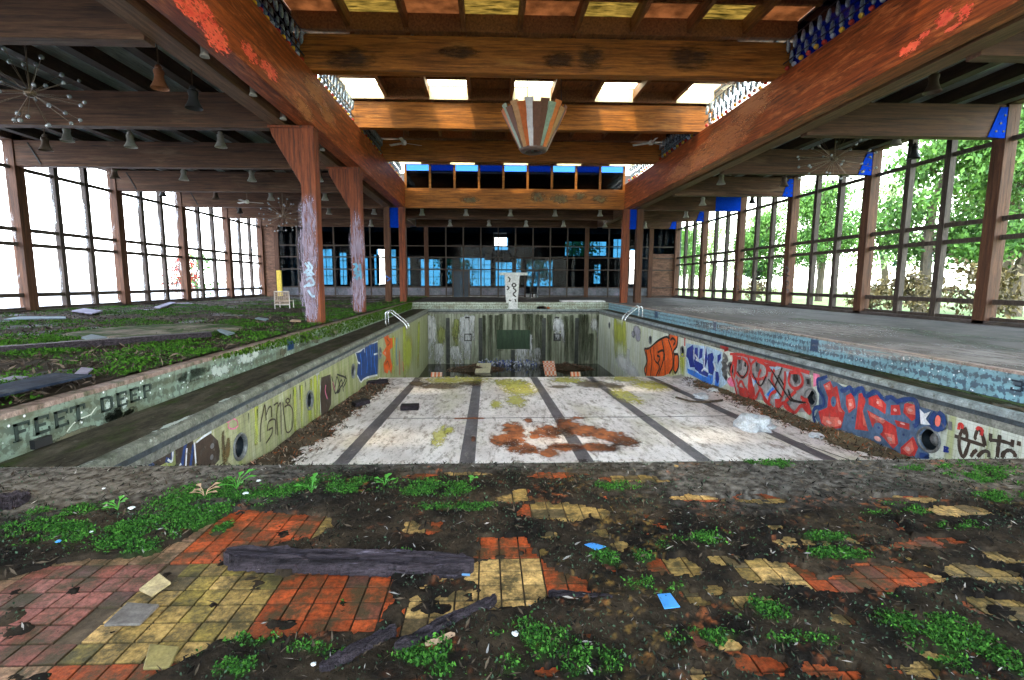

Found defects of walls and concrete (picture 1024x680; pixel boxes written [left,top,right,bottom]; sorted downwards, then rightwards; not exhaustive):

peeling [298,198,319,320]
peeling [349,213,365,312]
water stain [393,314,599,389]
rust [490,417,639,462]